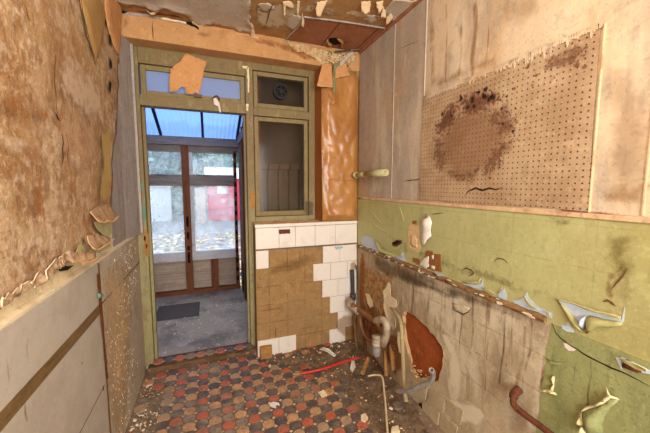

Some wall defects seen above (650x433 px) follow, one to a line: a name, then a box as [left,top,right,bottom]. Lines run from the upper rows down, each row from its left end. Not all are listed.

peeling [316,0,327,17]
peeling [361,1,393,25]
water stain [546,46,588,70]
water stain [434,87,518,181]
crack [466,186,502,194]
peeling [410,213,440,248]
peeling [258,247,337,349]
water stain [363,259,434,345]
flaking render [359,236,552,319]
water stain [386,336,401,373]
spalling [383,282,464,433]
crack [552,324,647,385]